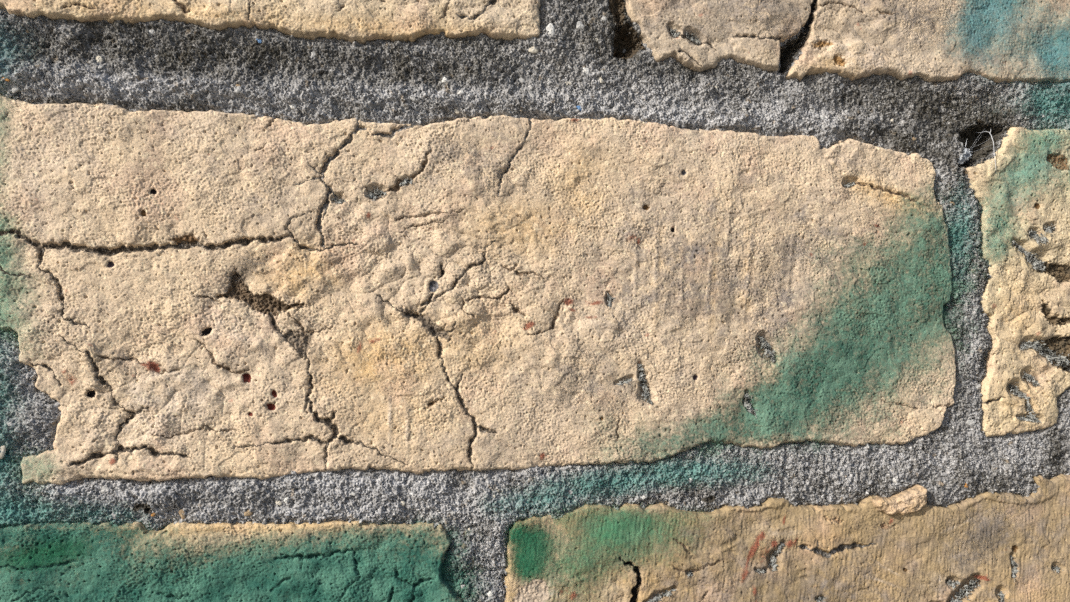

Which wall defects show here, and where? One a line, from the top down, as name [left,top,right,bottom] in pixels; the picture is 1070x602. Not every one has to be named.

crack [174,0,190,13]
crack [441,0,496,20]
crack [668,0,894,66]
crack [498,118,532,196]
crack [366,151,464,231]
crack [0,119,419,470]
spalling [1026,256,1070,283]
crack [377,241,563,471]
spalling [1038,302,1070,373]
crack [619,557,642,602]
crack [672,539,721,602]